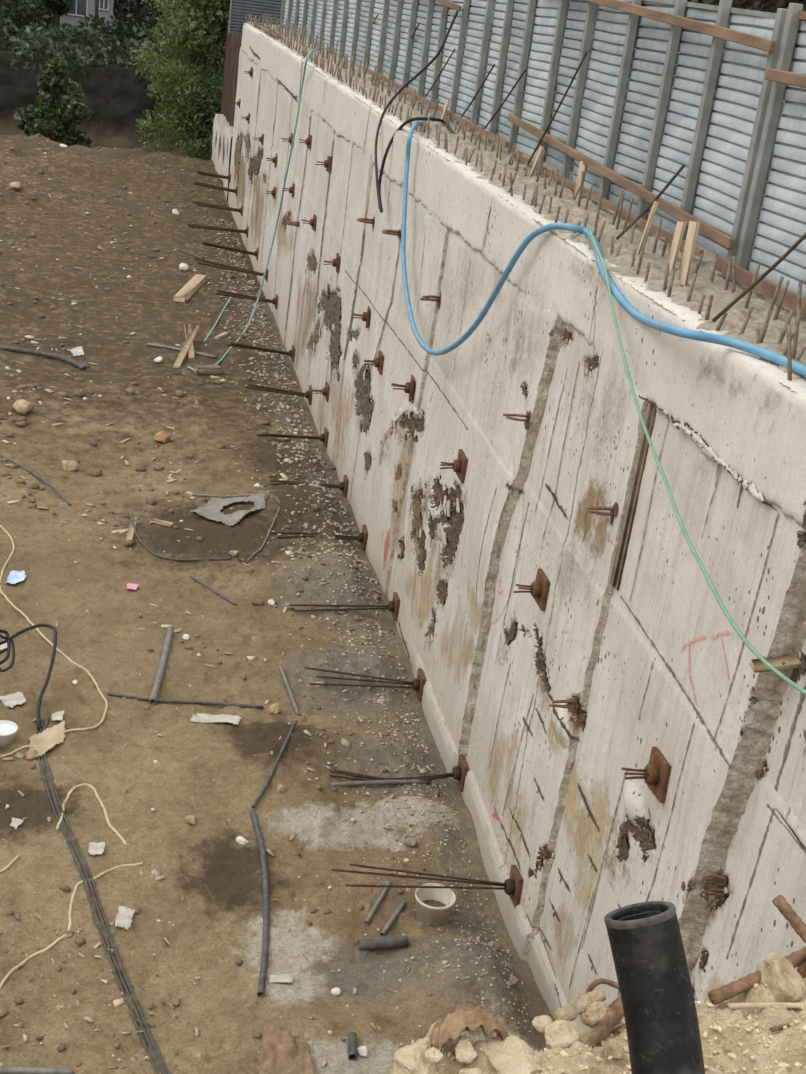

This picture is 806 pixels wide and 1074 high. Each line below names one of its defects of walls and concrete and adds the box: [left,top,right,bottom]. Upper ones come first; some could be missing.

spalling [305,250,317,274]
spalling [307,283,330,355]
crack [638,395,777,511]
crack [798,501,806,527]
spalling [392,476,465,643]
spalling [501,612,550,692]
spalling [528,844,554,881]